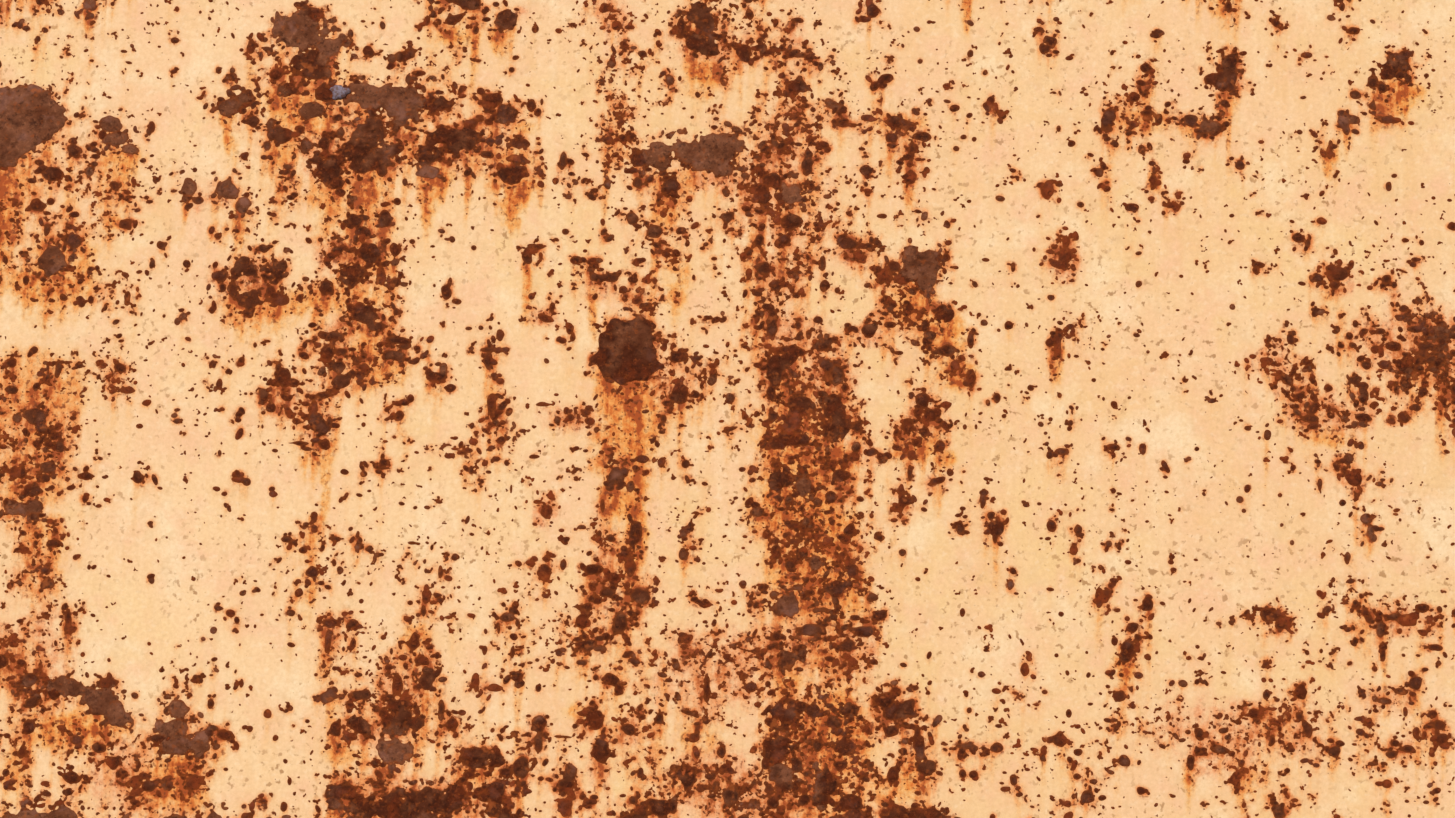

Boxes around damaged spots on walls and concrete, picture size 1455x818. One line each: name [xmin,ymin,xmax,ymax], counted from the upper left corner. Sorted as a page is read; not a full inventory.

rust [630,768,647,781]